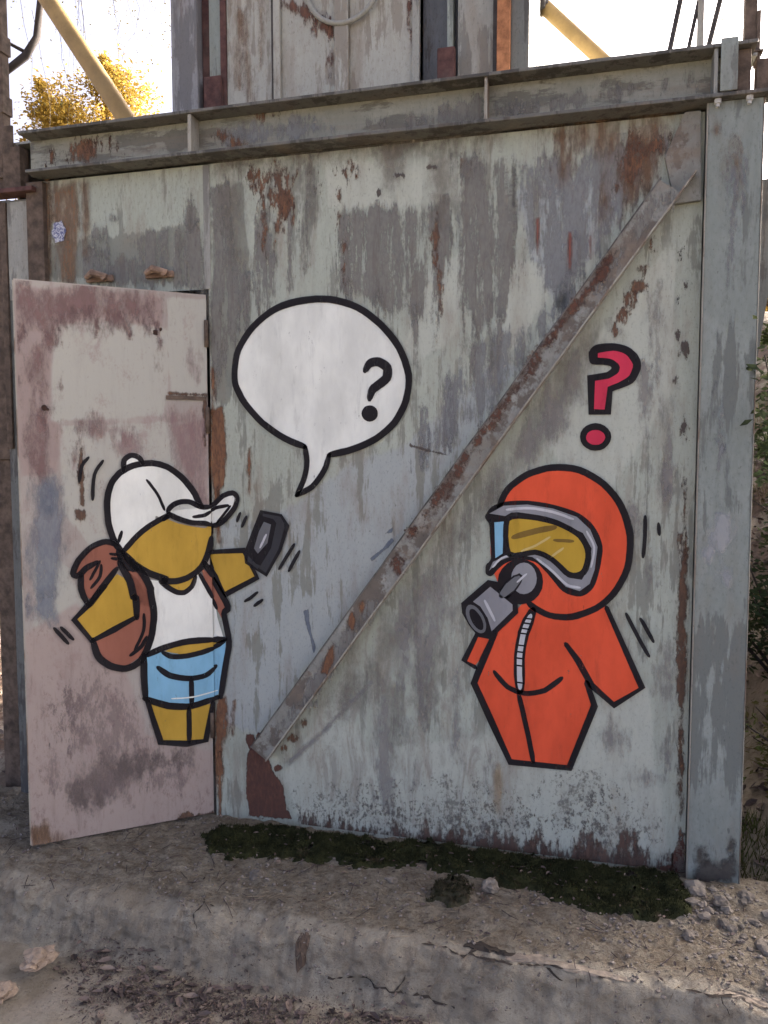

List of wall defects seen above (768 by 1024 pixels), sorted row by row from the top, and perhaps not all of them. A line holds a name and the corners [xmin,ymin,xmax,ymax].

corrosion [45,135,125,167]
corrosion [615,127,673,193]
corrosion [245,160,322,257]
corrosion [611,265,648,337]
corrosion [168,367,227,500]
corrosion [404,252,616,538]
corrosion [390,554,405,575]
corrosion [675,480,689,815]
corrosion [178,697,236,819]
peeling [293,770,656,859]
crack [328,976,455,1009]